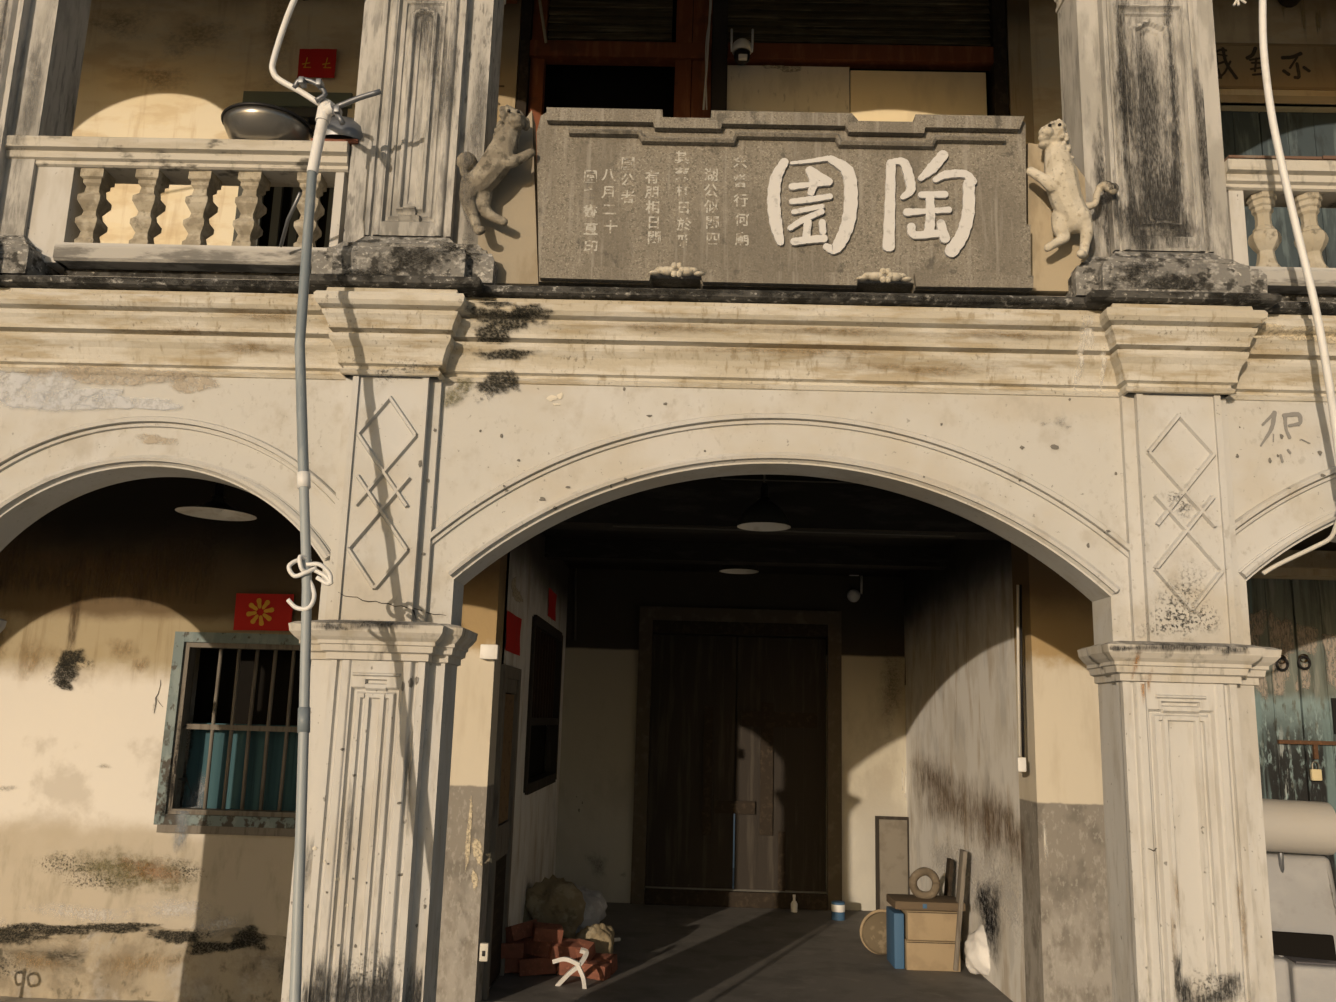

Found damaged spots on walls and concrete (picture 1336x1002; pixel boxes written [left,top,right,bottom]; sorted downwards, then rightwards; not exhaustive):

damp [1094,0,1187,253]
damp [1195,83,1210,238]
flaking render [28,366,215,393]
mould [467,299,553,400]
damp [53,649,89,691]
damp [923,764,1019,852]
damp [45,855,193,888]
mould [1175,960,1240,1002]